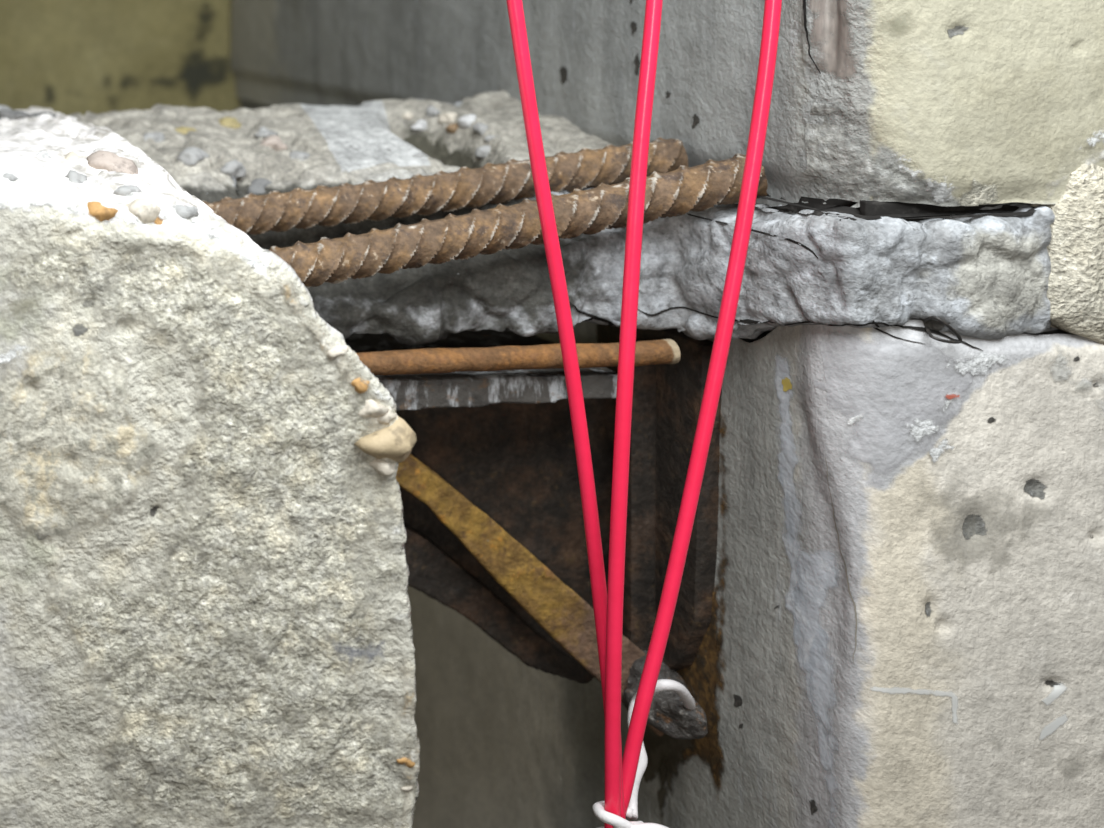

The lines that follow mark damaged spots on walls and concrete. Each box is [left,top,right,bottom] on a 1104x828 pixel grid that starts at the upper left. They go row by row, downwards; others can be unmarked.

water stain [153,52,229,100]
spalling [0,105,544,315]
spalling [545,141,633,239]
spalling [643,137,746,224]
spalling [756,166,768,199]
crack [687,193,1038,258]
spalling [801,102,998,206]
peeling [1087,131,1104,158]
crack [569,302,616,327]
crack [638,307,983,351]
peeling [11,244,420,828]
corrosion [676,549,728,790]